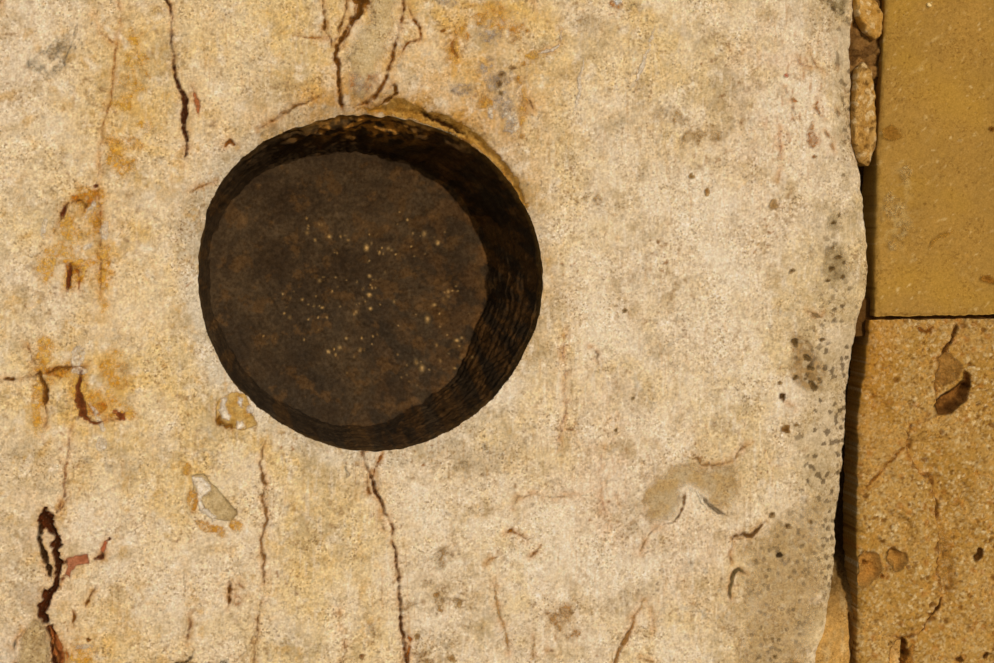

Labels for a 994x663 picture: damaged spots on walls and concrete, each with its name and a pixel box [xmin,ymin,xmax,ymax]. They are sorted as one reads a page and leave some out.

crack [165,0,200,157]
crack [304,0,422,108]
crack [5,366,125,425]
crack [37,439,94,663]
spalling [183,463,242,536]
crack [345,451,412,663]
crack [867,447,904,488]
crack [922,538,951,630]